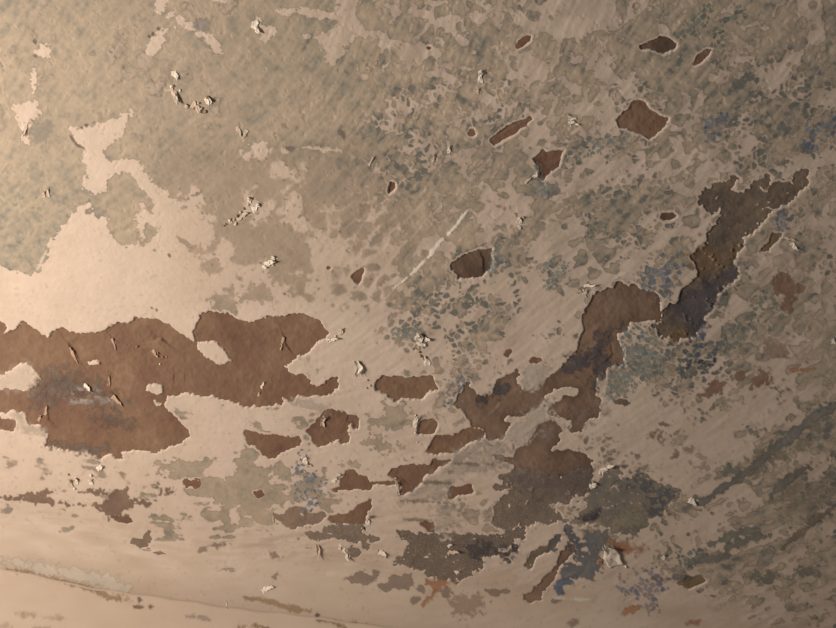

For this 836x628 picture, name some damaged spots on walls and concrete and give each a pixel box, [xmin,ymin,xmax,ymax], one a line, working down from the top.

leakage [394,237,445,289]
leakage [665,256,739,339]
leakage [772,272,806,314]
leakage [560,292,657,392]
flaking render [0,294,343,486]
peeling [359,401,438,455]
leakage [696,369,773,399]
peeling [130,514,184,555]
peeling [154,422,452,562]
flaking render [524,534,576,603]
leakage [548,467,679,603]
peeling [653,409,836,621]